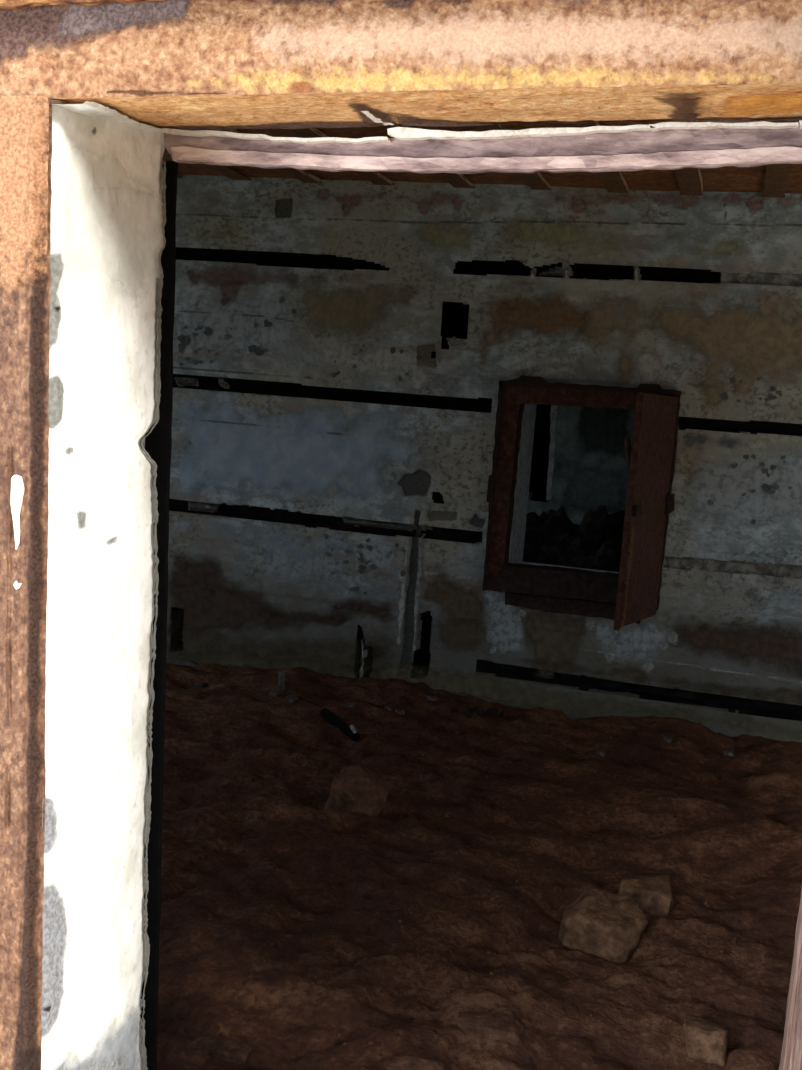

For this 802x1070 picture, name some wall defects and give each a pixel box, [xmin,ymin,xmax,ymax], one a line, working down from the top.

leakage [190,268,413,334]
flaking render [141,159,166,1070]
leakage [168,556,708,720]
leakage [674,623,802,678]